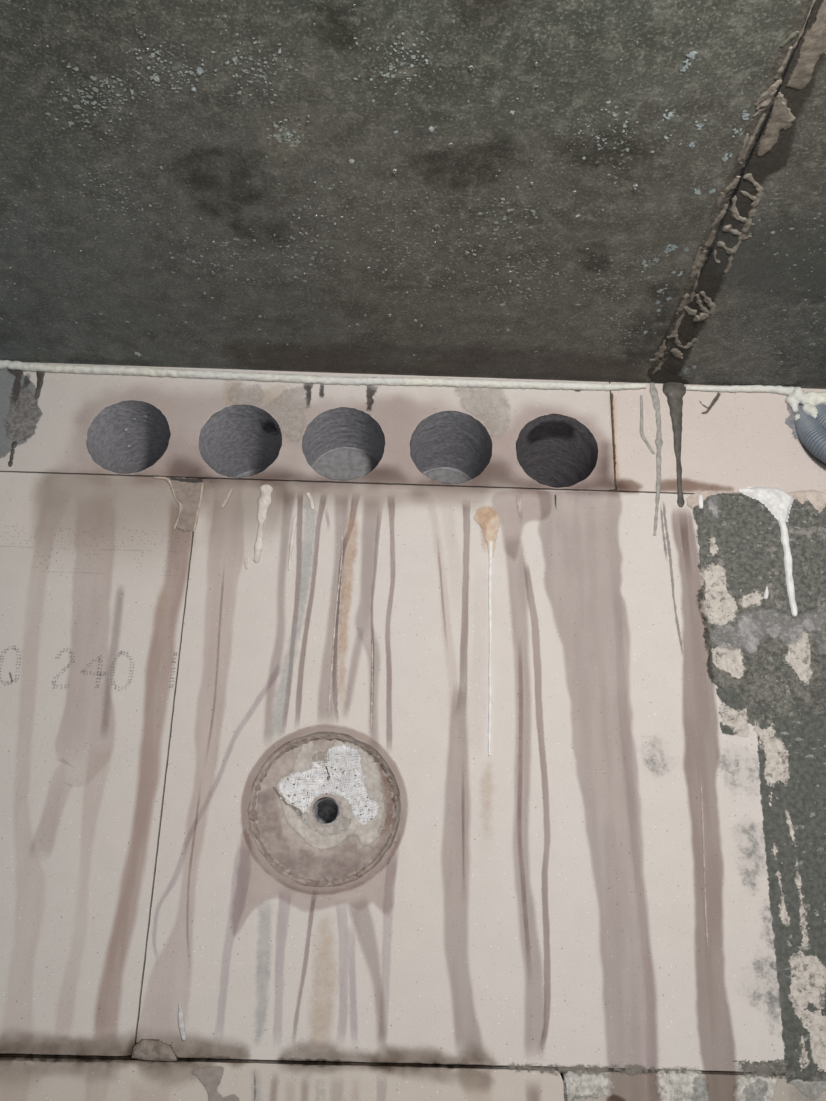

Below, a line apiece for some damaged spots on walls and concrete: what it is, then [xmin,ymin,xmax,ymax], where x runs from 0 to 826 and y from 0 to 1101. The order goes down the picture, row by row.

damp [641,244,689,273]
damp [391,348,497,376]
damp [540,359,604,381]
damp [229,345,367,440]
damp [649,365,696,536]
damp [253,484,274,563]
peeling [708,496,719,519]
peeling [701,537,824,684]
peeling [718,708,790,806]
damp [0,1048,129,1062]
damp [508,1062,687,1076]
spalling [654,1066,710,1101]